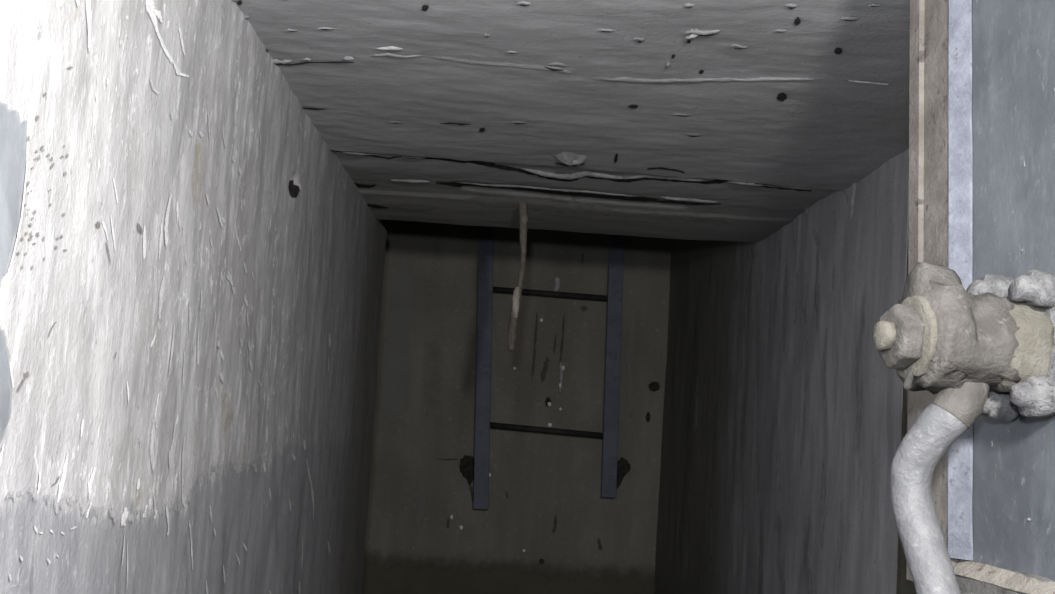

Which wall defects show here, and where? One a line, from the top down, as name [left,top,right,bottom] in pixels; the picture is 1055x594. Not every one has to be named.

spalling [684,29,721,43]
peeling [0,101,69,286]
crack [332,150,812,192]
damp [143,192,181,321]
damp [149,391,162,473]
damp [57,454,68,506]
damp [361,557,655,594]